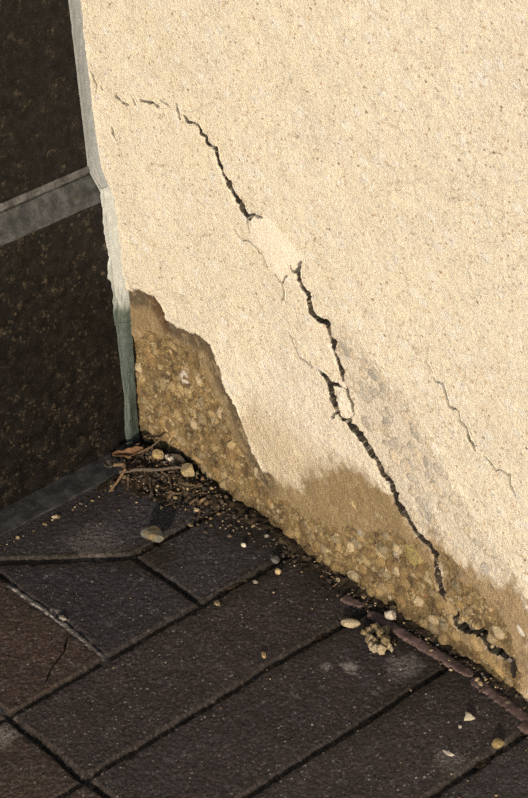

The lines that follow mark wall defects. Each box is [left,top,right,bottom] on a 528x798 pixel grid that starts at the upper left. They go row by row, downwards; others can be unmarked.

crack [89,69,518,680]
damp [125,286,528,699]
spalling [133,306,525,694]